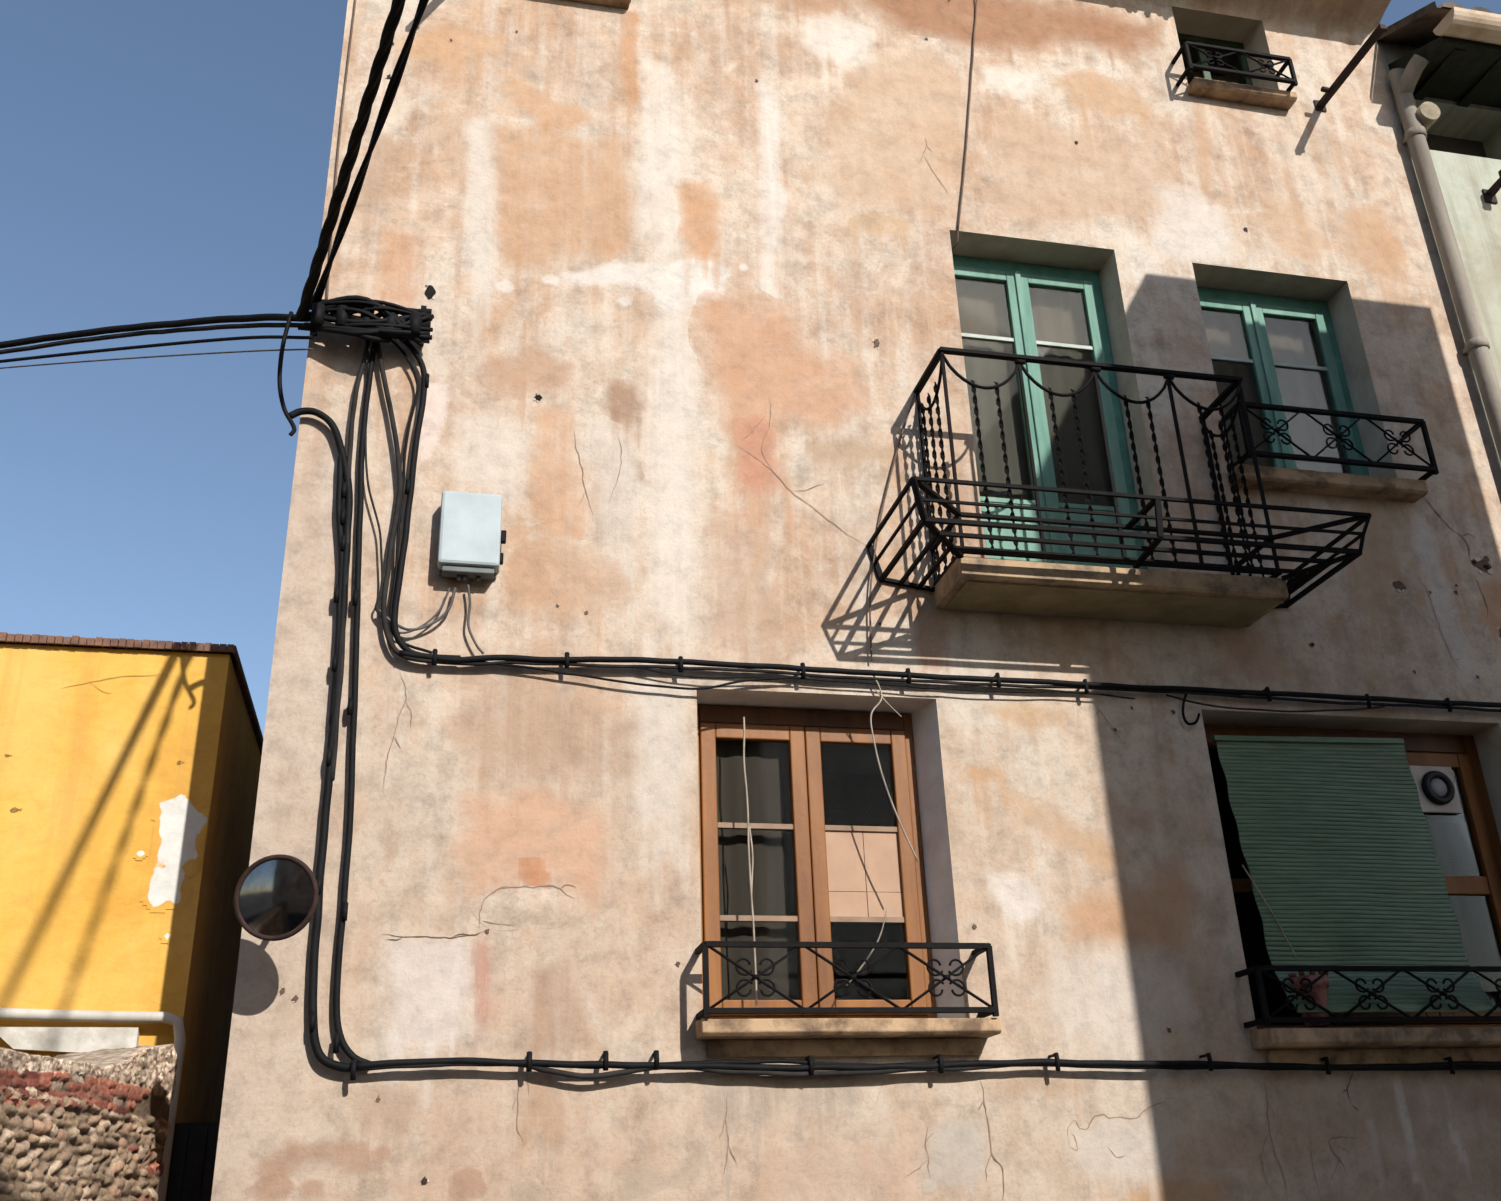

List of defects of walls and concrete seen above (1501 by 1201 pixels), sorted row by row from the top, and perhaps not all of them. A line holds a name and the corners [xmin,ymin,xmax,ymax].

peeling [133,787,209,943]
crack [387,884,575,941]
crack [1067,1102,1173,1158]